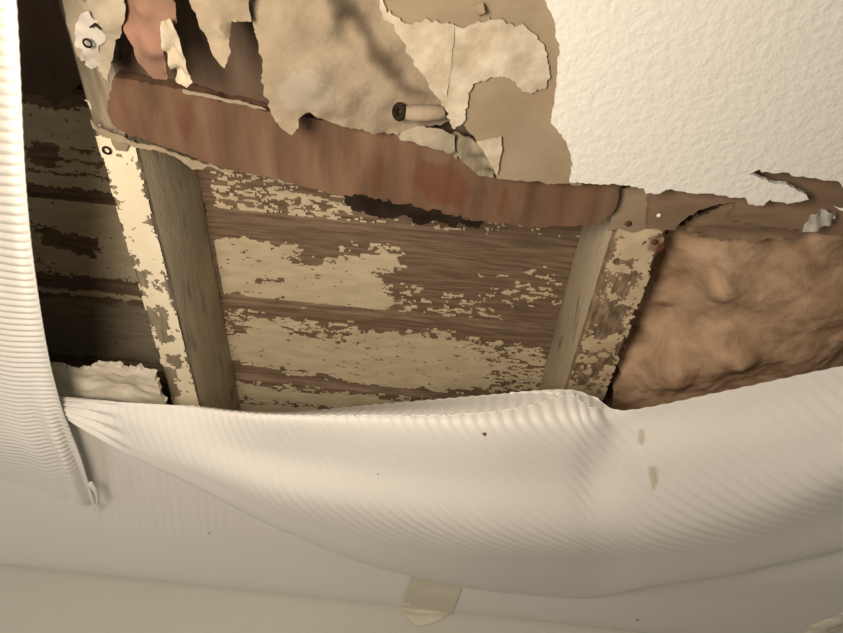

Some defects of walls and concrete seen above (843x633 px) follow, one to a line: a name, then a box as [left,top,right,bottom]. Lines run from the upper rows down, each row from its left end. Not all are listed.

water stain [279,68,332,110]
water stain [331,0,399,78]
peeling [375,0,582,186]
peeling [22,99,199,406]
peeling [209,163,398,223]
peeling [214,236,562,412]
peeling [567,227,664,400]
peeling [802,206,843,232]